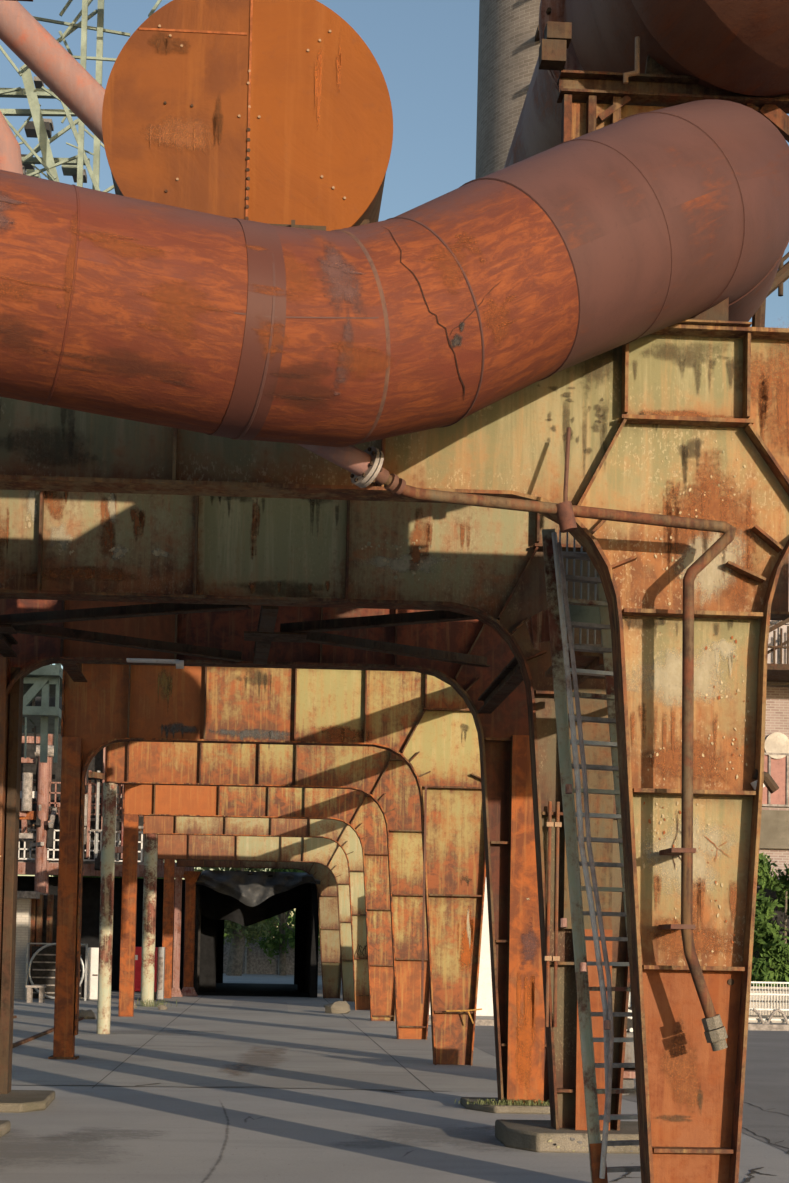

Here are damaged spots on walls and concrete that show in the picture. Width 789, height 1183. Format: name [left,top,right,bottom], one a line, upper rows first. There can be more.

rust [213,98,223,140]
rust [0,170,579,447]
crack [381,226,500,401]
water stain [657,345,734,389]
rust [44,491,68,519]
rust [101,496,117,558]
rust [663,452,755,601]